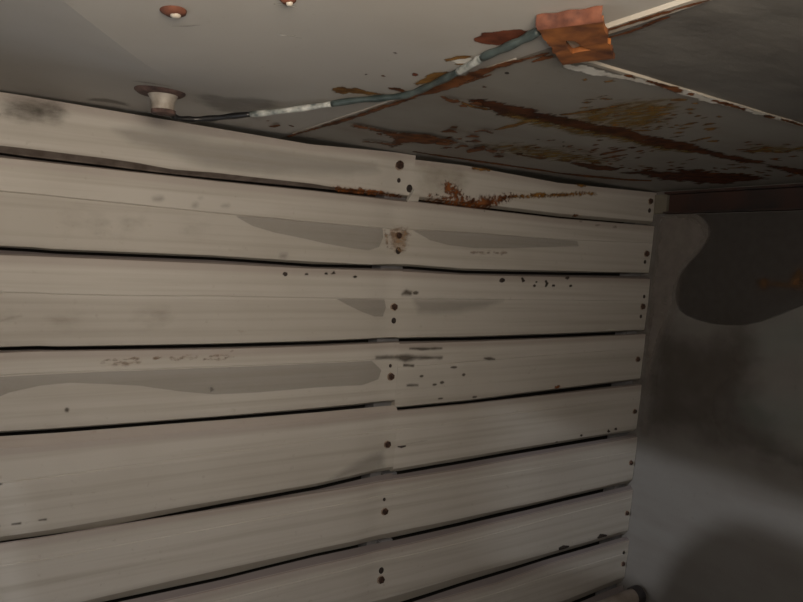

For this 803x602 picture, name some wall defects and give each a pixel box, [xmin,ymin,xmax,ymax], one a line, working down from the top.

corrosion [268,53,803,209]
peeling [563,64,666,89]
peeling [677,88,803,125]
damp [675,211,803,325]